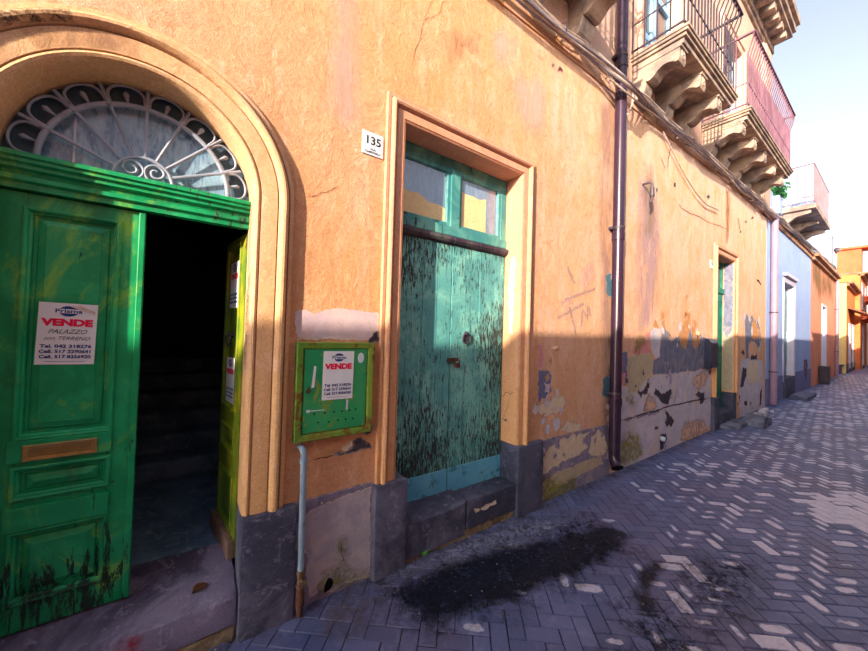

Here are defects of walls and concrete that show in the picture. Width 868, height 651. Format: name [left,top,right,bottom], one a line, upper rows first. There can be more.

leakage [0,7,73,26]
flaking render [294,308,379,343]
spalling [317,425,374,459]
peeling [532,343,610,499]
flaking render [621,294,711,468]
flaking render [722,263,764,417]